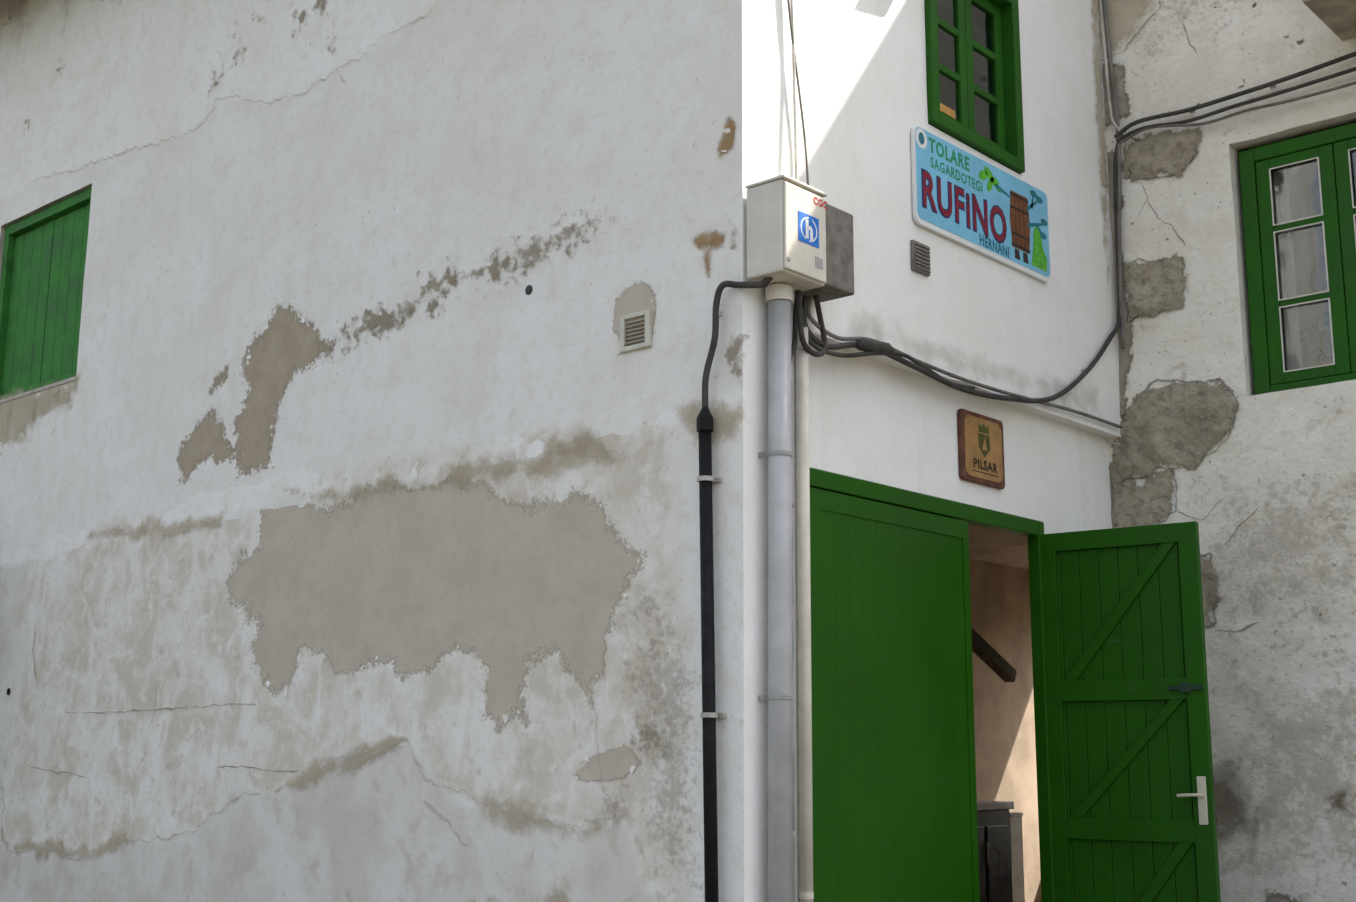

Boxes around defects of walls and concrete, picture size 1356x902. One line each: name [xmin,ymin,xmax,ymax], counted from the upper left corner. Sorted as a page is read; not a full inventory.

crack [35,10,431,181]
flaking render [718,118,735,156]
flaking render [1102,63,1132,133]
flaking render [176,301,336,484]
flaking render [1107,127,1239,528]
flaking render [225,466,646,733]
flaking render [575,745,640,782]
flaking render [1254,889,1297,902]